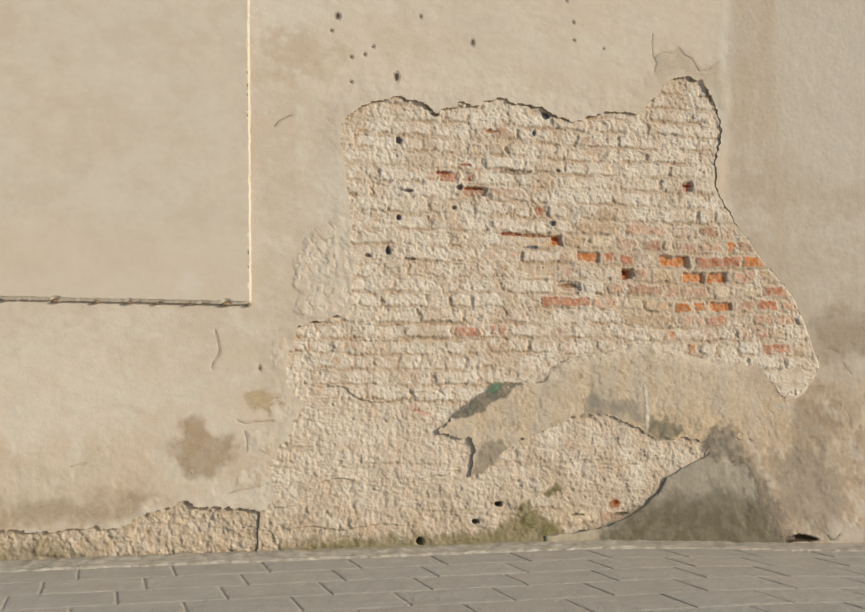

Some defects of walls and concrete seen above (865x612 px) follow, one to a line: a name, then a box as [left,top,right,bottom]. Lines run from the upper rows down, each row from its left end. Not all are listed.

crack [652,37,717,71]
spalling [0,76,819,561]
damp [179,418,231,477]
damp [602,458,794,543]